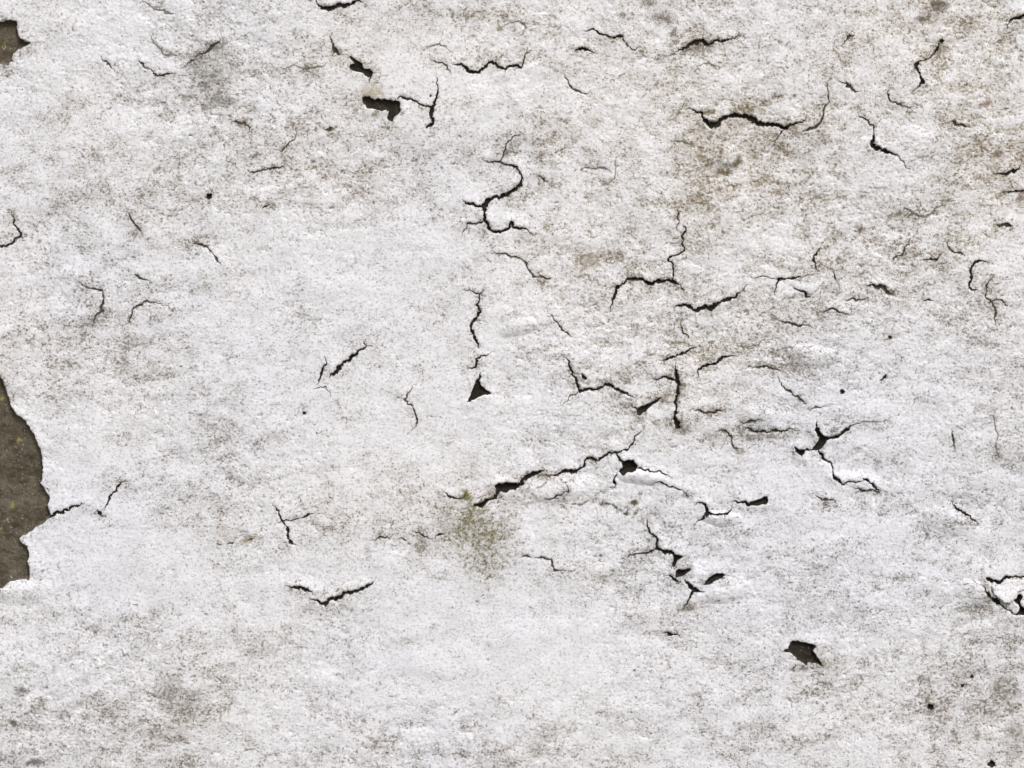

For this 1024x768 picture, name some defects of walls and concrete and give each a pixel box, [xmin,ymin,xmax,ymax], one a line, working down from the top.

spalling [0,20,31,65]
crack [397,20,531,128]
crack [670,80,910,169]
crack [461,133,551,280]
crack [893,203,1008,325]
crack [314,342,373,393]
crack [442,209,894,524]
spalling [0,377,51,588]
crack [275,506,313,545]
crack [284,580,375,606]
crack [630,519,725,608]
spalling [784,641,823,666]